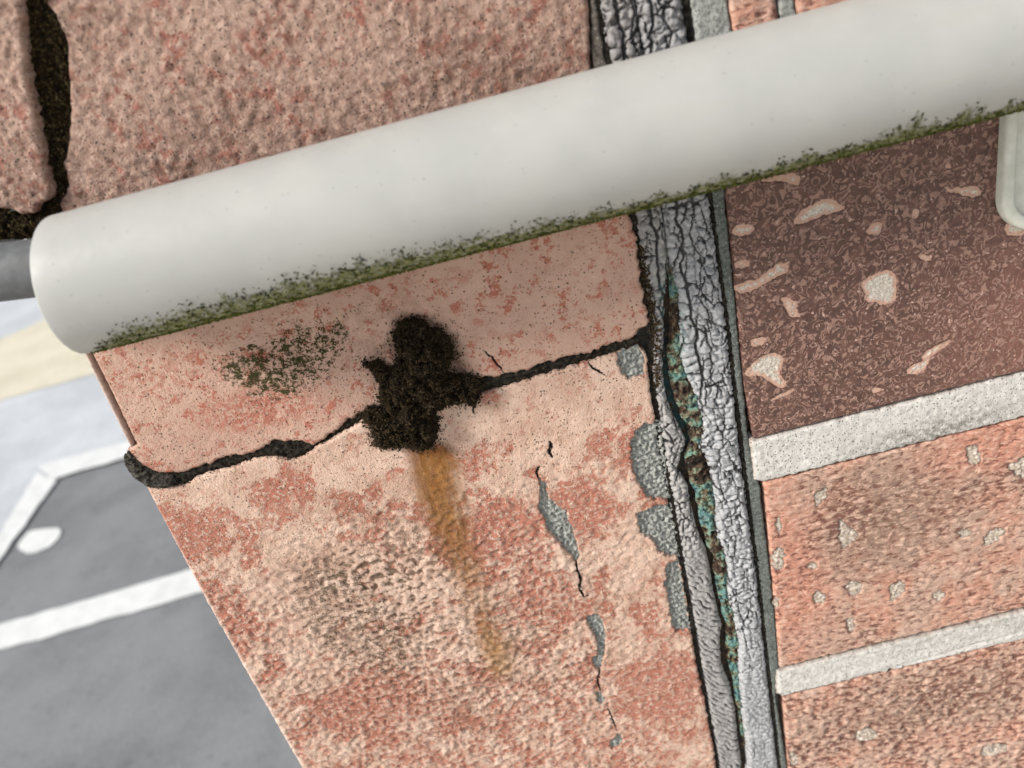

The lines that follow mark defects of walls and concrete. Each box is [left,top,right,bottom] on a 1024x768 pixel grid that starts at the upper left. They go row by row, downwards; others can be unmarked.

crack [0,0,72,240]
crack [124,404,385,489]
rust [411,446,470,568]
crack [472,248,746,768]
spalling [617,344,644,377]
spalling [630,420,691,630]